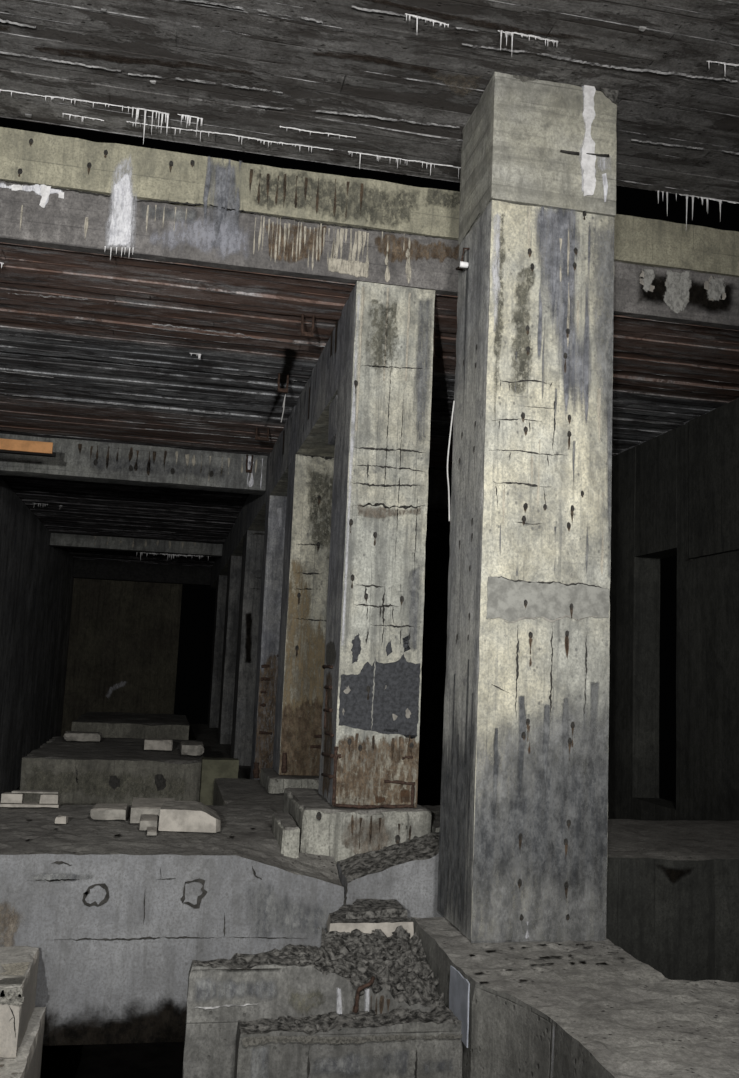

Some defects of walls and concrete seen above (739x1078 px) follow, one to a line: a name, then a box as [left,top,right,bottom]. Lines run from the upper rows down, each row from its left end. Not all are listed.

water stain [0,183,64,208]
efflorescence [580,85,608,202]
water stain [640,275,668,302]
water stain [687,281,732,311]
water stain [78,156,460,650]
water stain [493,207,614,575]
corrosion [255,561,419,808]
peeling [310,633,421,809]